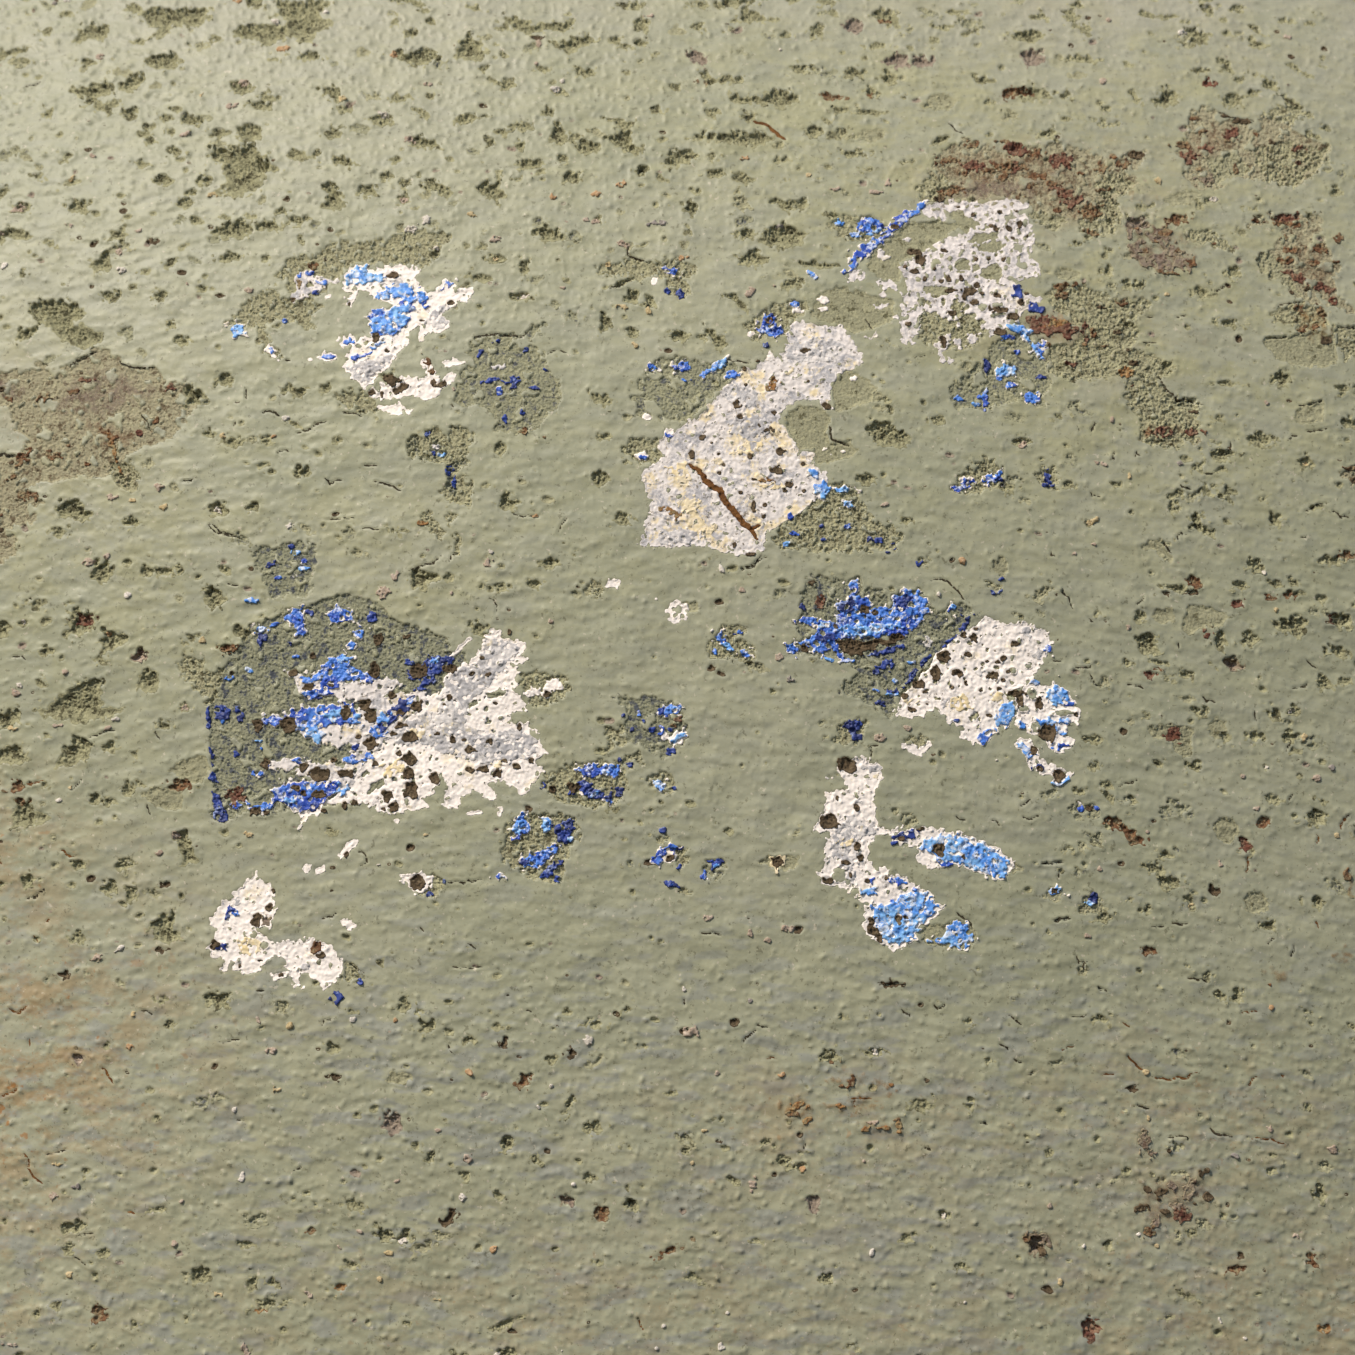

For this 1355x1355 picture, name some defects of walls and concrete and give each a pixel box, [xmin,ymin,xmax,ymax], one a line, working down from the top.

corrosion [1168,104,1331,190]
corrosion [914,137,1237,275]
corrosion [0,347,205,564]
peeling [0,0,1355,984]
crack [688,463,766,570]
spalling [198,987,233,1028]
spalling [489,1010,534,1091]
spalling [544,974,635,1069]
spalling [818,1042,891,1071]
spalling [725,1120,812,1193]
spalling [245,1259,361,1315]
spalling [1224,1252,1247,1276]